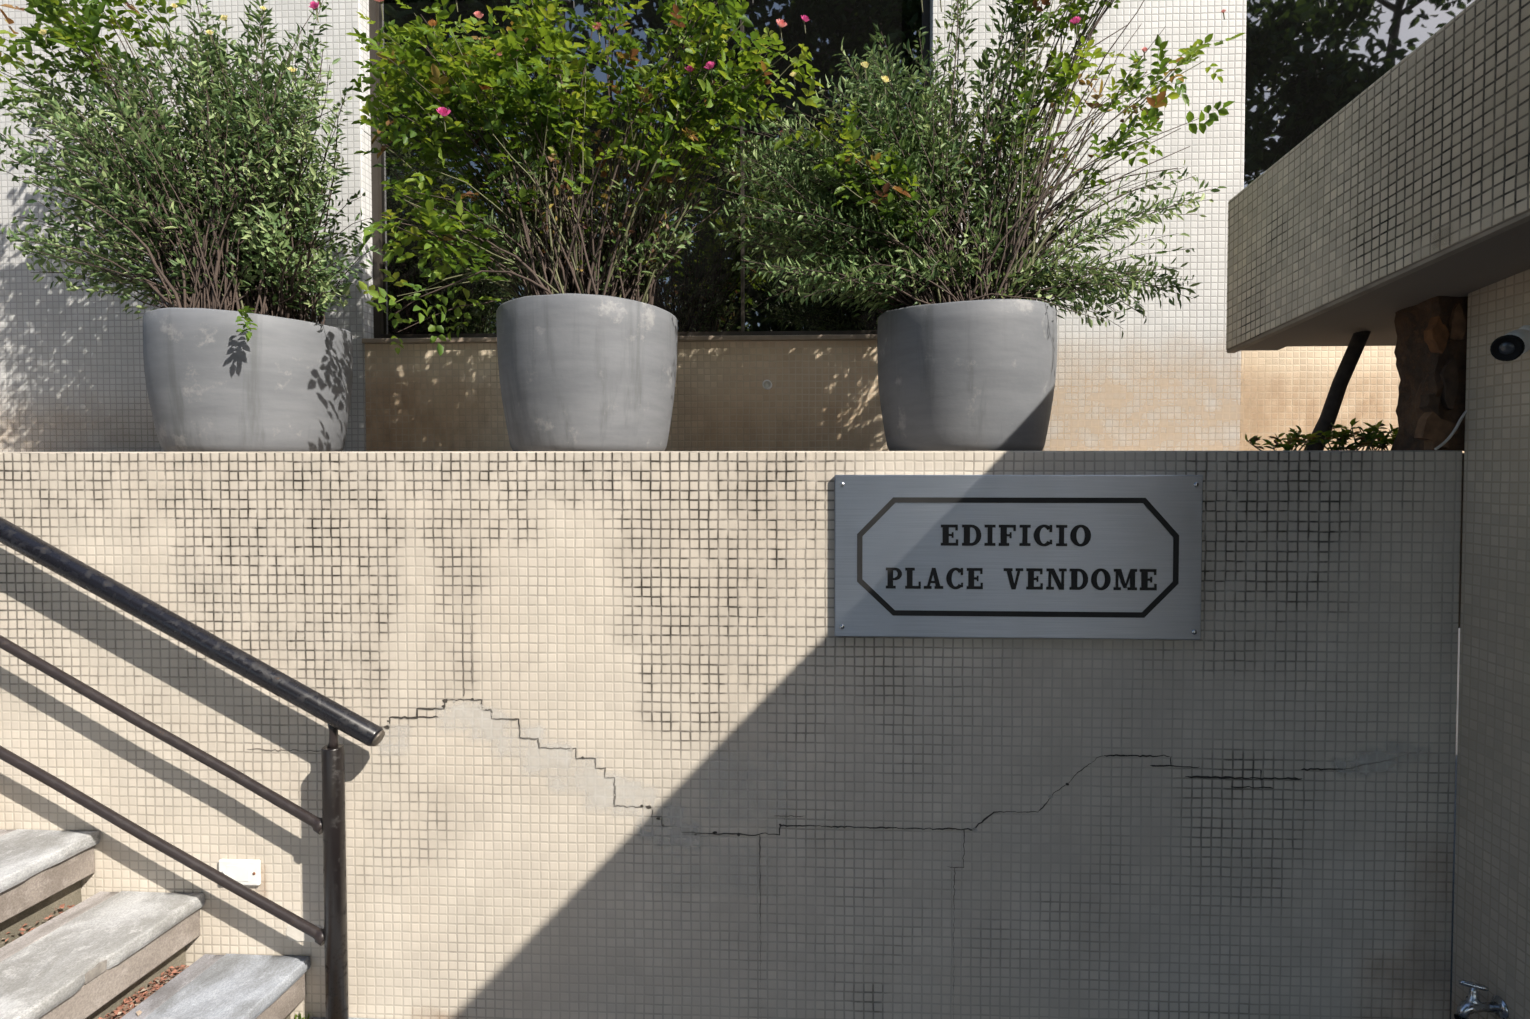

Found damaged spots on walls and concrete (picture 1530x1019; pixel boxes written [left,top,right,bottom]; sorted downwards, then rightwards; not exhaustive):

water stain [0,452,835,741]
crack [380,586,1421,1019]